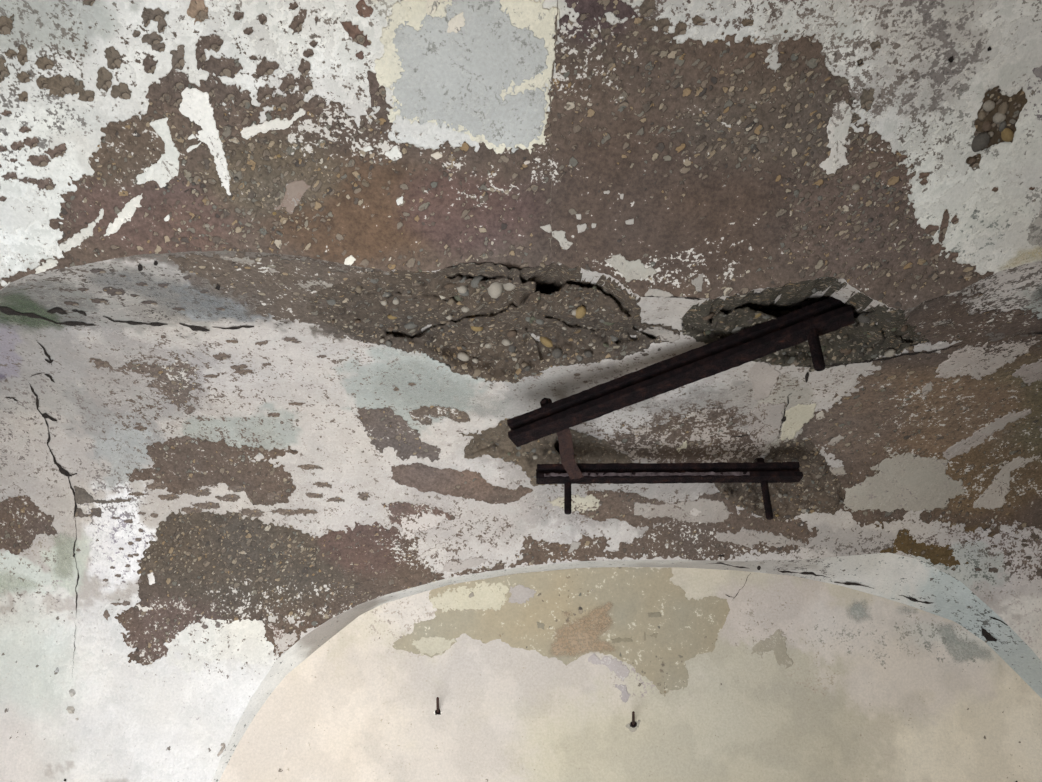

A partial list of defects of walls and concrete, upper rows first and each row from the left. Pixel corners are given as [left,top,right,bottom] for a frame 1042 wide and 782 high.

crack [548,0,558,256]
peeling [0,0,1042,573]
peeling [66,689,79,721]
crack [0,307,254,672]
peeling [110,436,505,666]
peeling [393,567,730,703]
peeling [751,629,793,669]